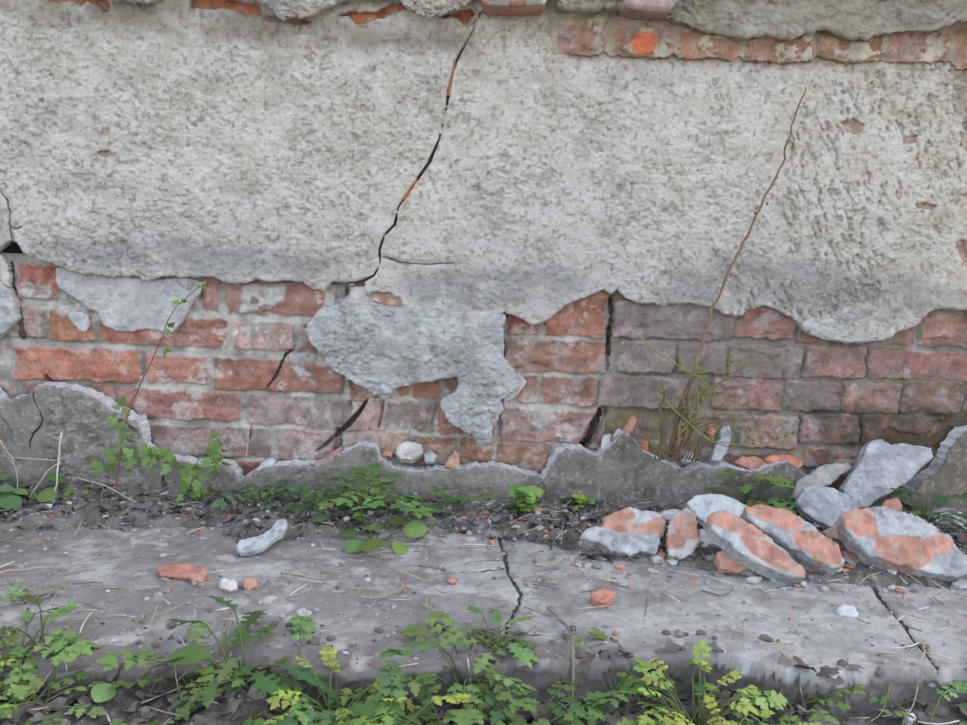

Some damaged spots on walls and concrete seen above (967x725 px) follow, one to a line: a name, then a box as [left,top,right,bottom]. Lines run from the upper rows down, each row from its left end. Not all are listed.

flaking render [49,0,110,12]
flaking render [193,0,309,26]
crack [344,14,481,298]
crack [0,191,27,340]
flaking render [0,253,967,502]
crack [0,393,44,448]
crack [343,399,368,431]